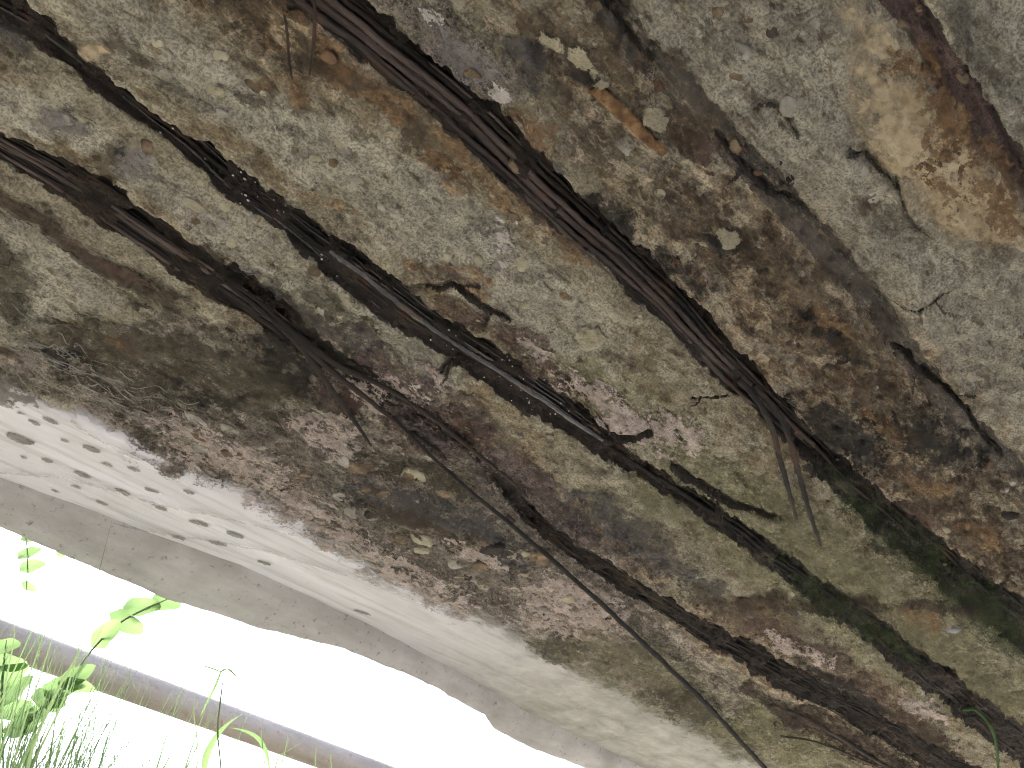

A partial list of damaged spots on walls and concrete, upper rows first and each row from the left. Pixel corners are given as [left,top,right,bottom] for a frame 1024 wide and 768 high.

corrosion [258,0,601,274]
spalling [366,0,537,112]
peeling [516,15,611,88]
peeling [642,79,670,133]
peeling [699,204,742,250]
crack [847,151,930,237]
damp [0,191,327,428]
damp [340,361,461,417]
crack [426,281,511,328]
corrosion [403,258,595,418]
damp [628,182,1024,593]
corrosion [295,344,674,584]